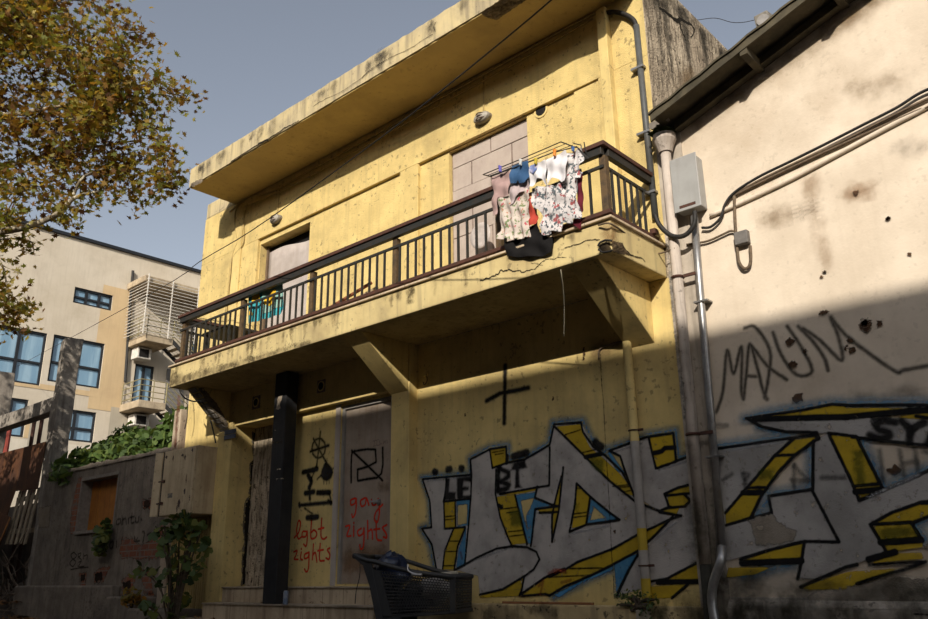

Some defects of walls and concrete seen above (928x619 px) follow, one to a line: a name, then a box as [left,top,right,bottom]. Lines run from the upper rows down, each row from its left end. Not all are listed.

spalling [482,0,525,20]
water stain [656,0,690,57]
crack [480,239,600,281]
peeling [808,576,928,602]